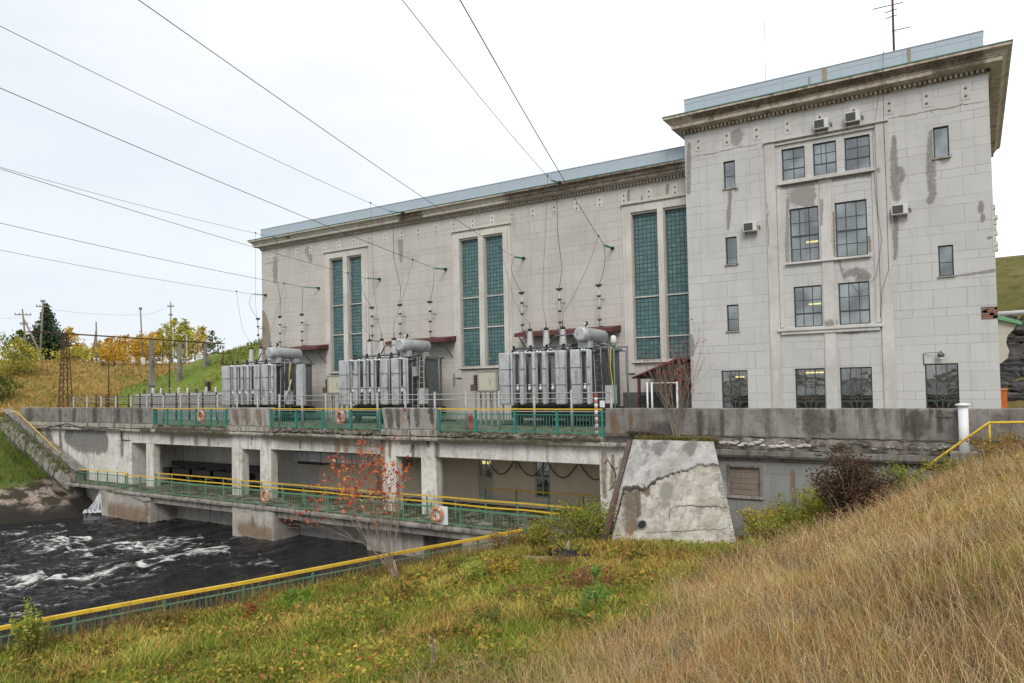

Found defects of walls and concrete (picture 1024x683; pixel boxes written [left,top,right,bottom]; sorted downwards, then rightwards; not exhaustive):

damp [781,136,904,262]
damp [926,130,950,204]
damp [844,268,870,282]
spalling [981,306,998,319]
crack [604,453,725,539]